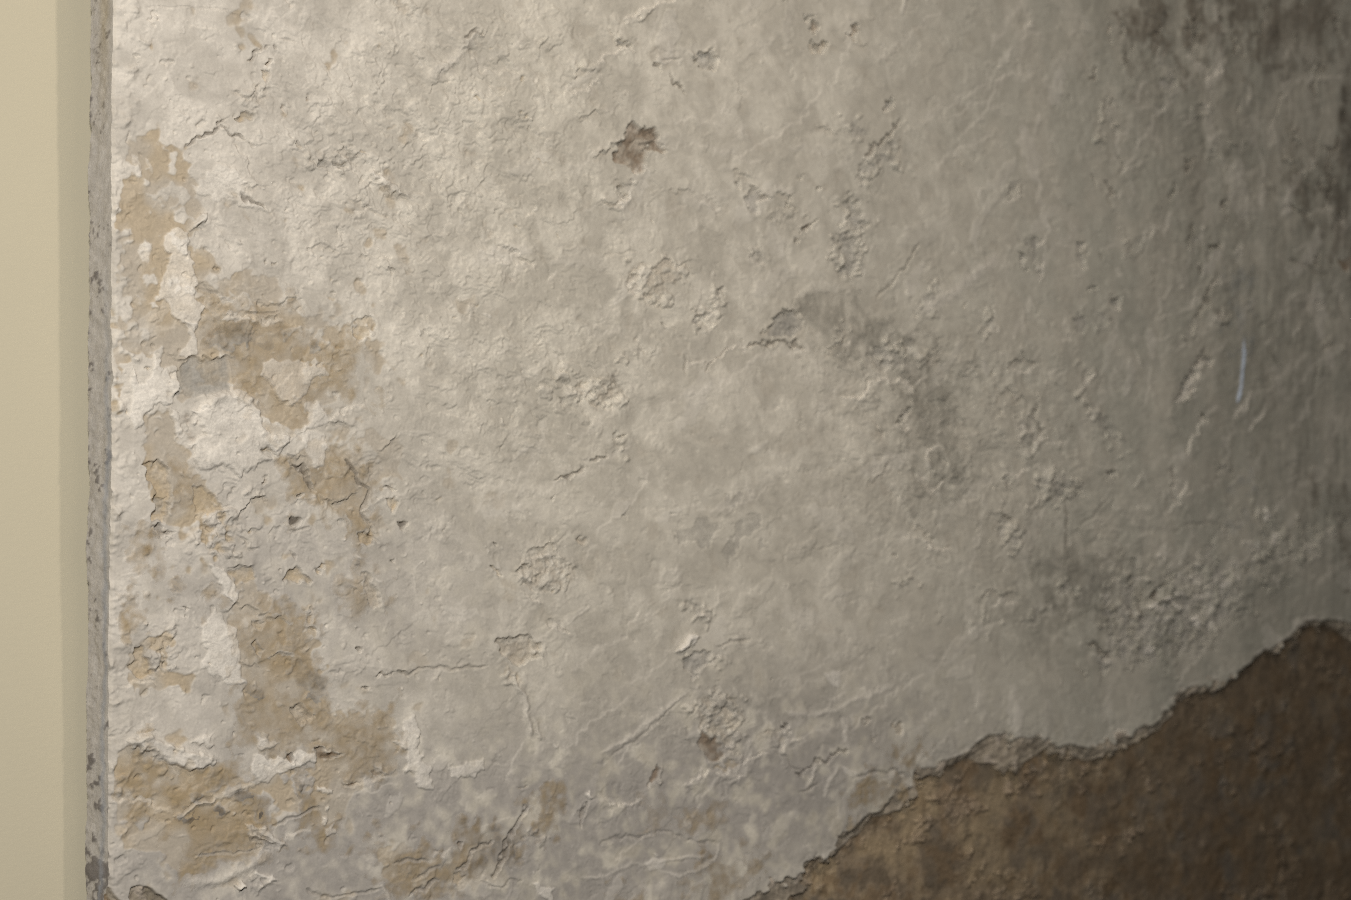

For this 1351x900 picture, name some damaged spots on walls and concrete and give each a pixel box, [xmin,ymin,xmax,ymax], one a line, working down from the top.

crack [184,118,257,149]
spalling [592,120,672,210]
crack [195,278,303,327]
crack [326,401,399,525]
spalling [489,535,590,600]
spalling [494,633,546,742]
spalling [674,599,806,789]
peeling [108,793,174,815]
crack [198,805,325,857]
flaking render [251,737,346,785]
peeling [317,714,485,837]
crack [307,881,394,900]